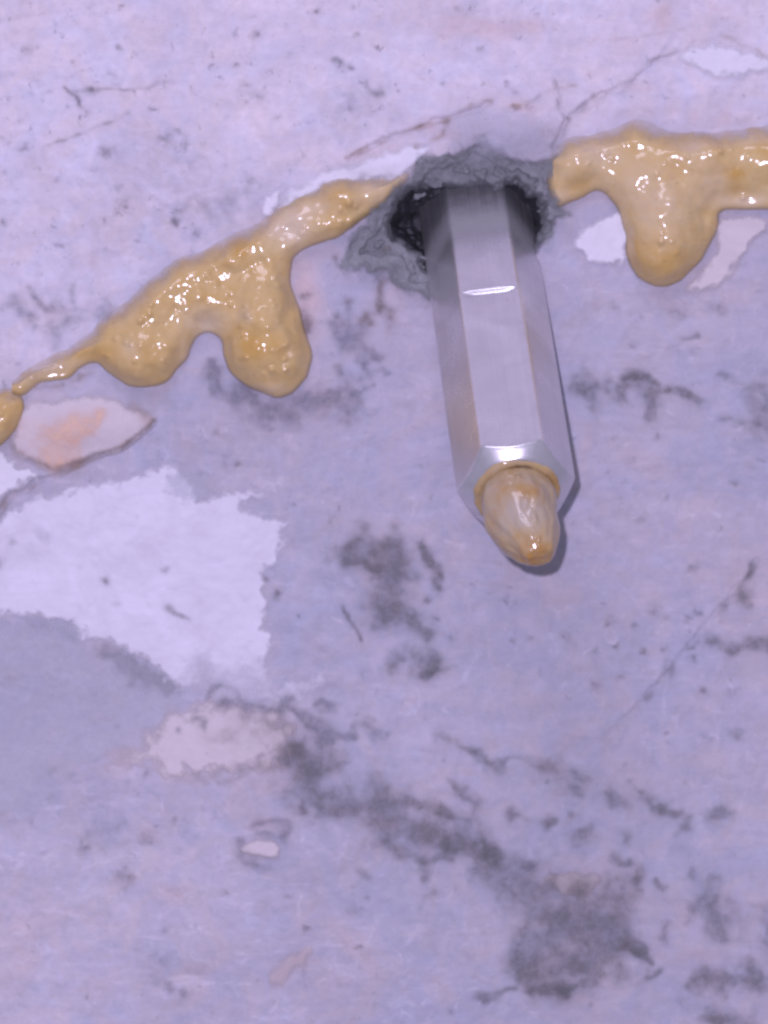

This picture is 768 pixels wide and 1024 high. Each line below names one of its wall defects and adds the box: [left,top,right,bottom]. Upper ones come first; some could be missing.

spalling [263,135,570,300]
peeling [575,213,626,263]
peeling [686,216,766,292]
peeling [0,452,37,496]
peeling [0,465,325,778]